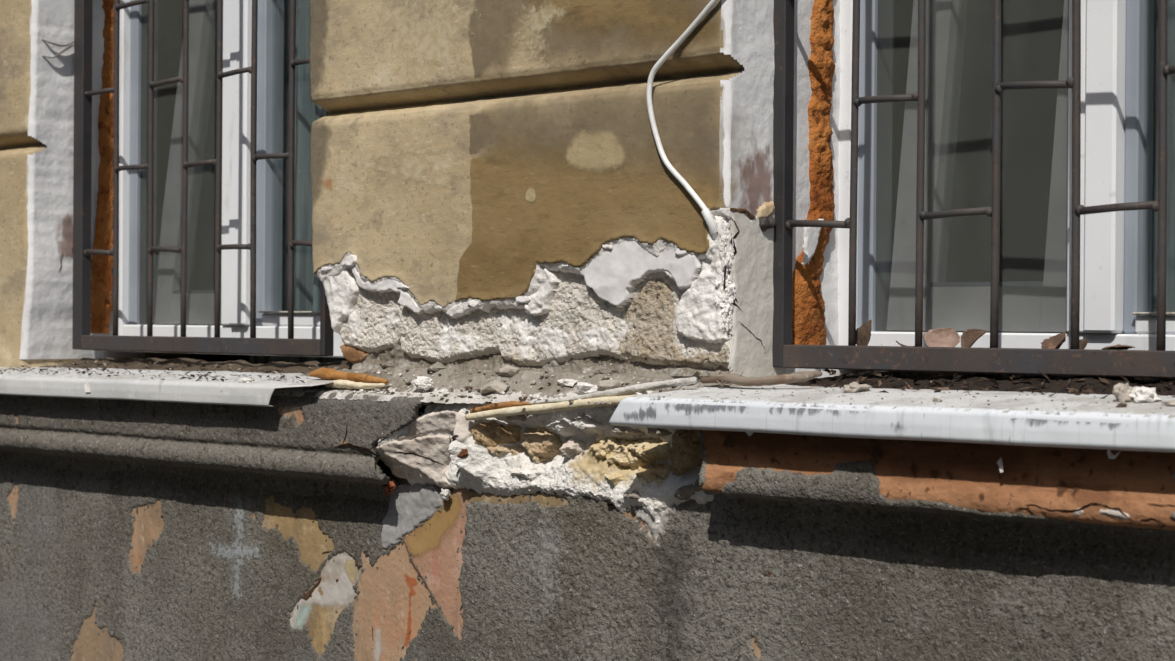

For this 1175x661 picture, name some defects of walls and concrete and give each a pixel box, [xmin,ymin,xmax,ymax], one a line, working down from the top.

flaking render [317,201,786,396]
peeling [129,500,164,574]
peeling [251,410,569,661]
peeling [701,430,1175,531]
crack [1014,503,1175,528]
peeling [71,603,124,661]